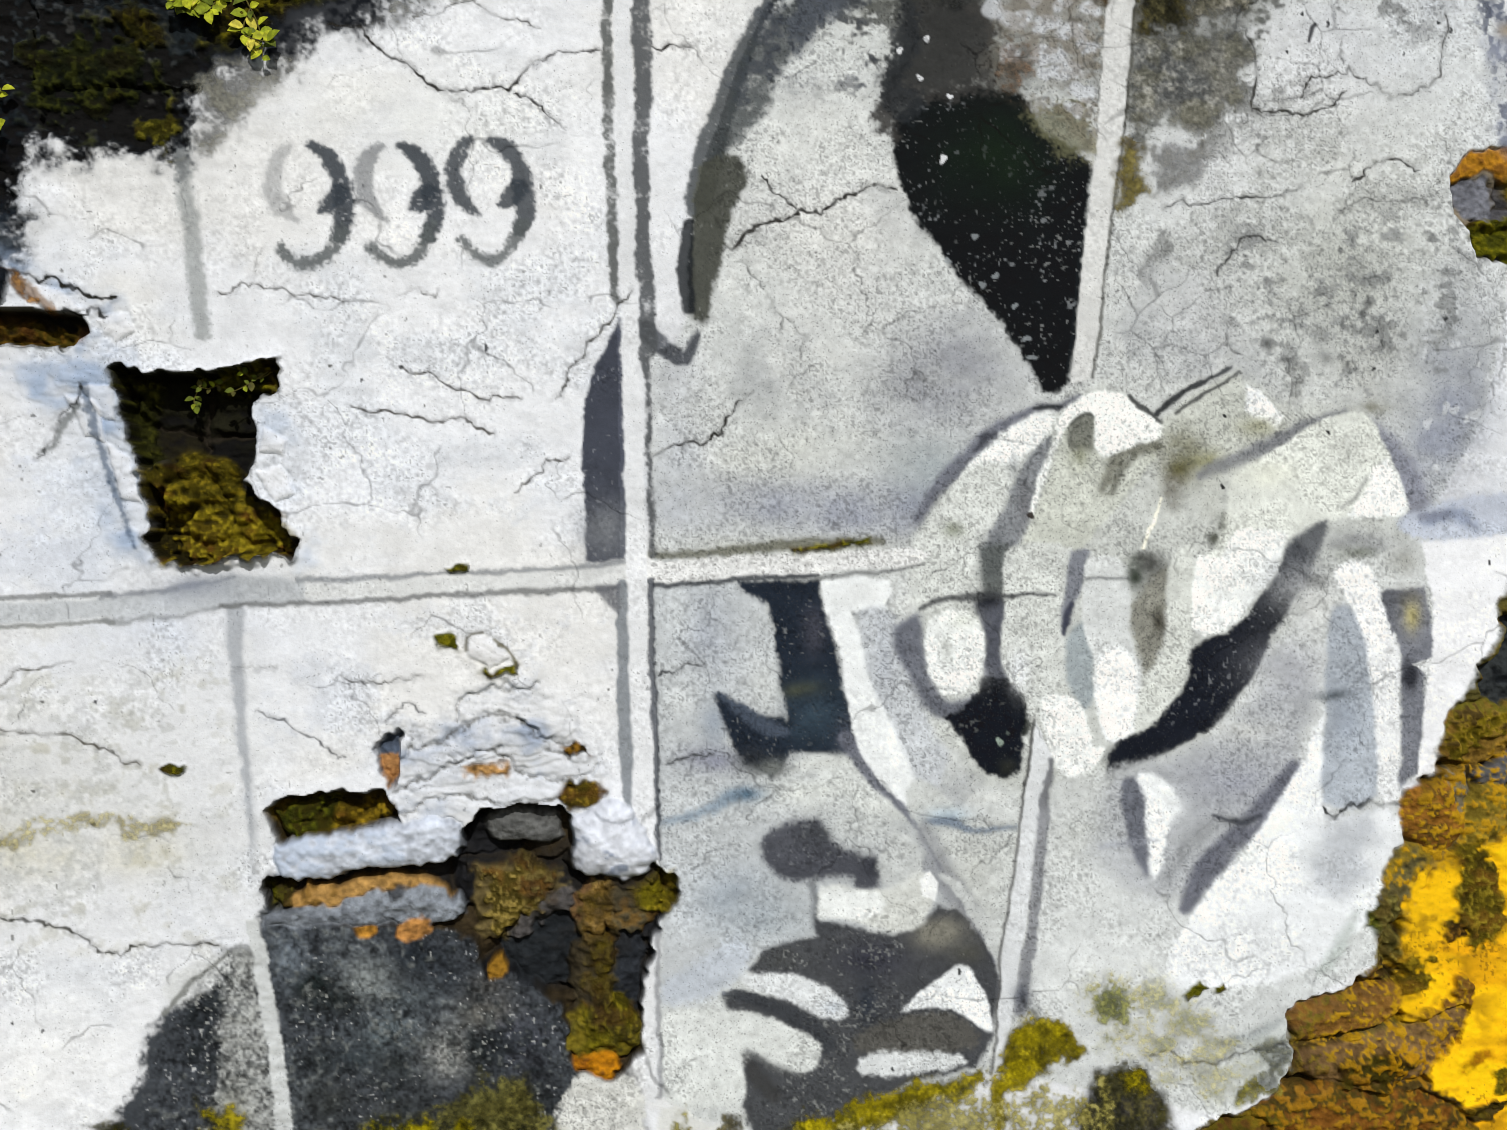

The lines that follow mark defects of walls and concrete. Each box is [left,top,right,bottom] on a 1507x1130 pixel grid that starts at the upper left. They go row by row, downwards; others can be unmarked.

flaking render [0,0,310,570]
crack [329,18,597,114]
crack [734,176,897,272]
crack [1240,1,1364,116]
flaking render [1450,34,1507,265]
crack [1,918,141,954]
flaking render [259,632,683,1083]
flaking render [1197,592,1507,1130]